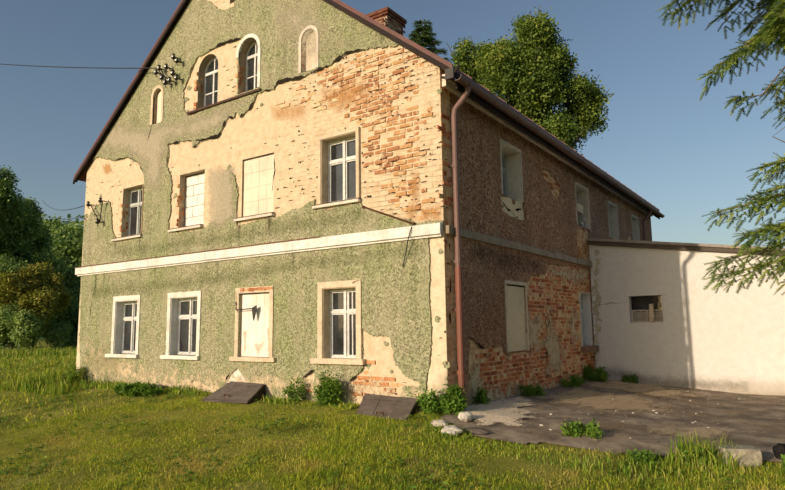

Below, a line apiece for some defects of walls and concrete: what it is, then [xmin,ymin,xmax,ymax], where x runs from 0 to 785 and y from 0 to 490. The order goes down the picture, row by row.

spalling [207,0,234,10]
flaking render [84,157,145,242]
spalling [161,39,458,404]
flaking render [500,195,524,220]
spalling [466,229,596,405]